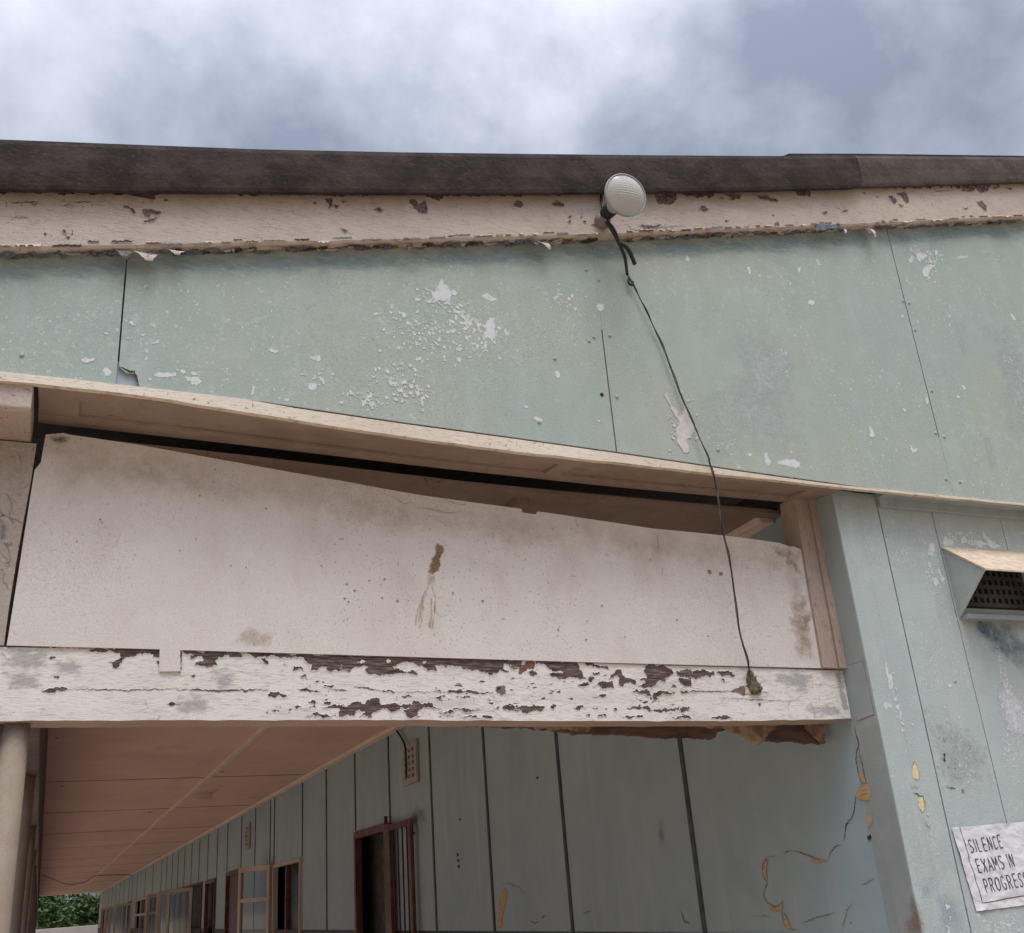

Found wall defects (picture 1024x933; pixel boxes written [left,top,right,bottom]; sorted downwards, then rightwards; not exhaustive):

peeling [0,194,605,261]
peeling [624,193,847,242]
peeling [862,184,1023,237]
peeling [284,278,509,412]
peeling [664,390,703,453]
damp [429,544,444,574]
peeling [3,647,159,689]
peeling [169,698,206,711]
peeling [177,650,735,720]
peeling [884,662,936,837]
crack [752,726,873,930]